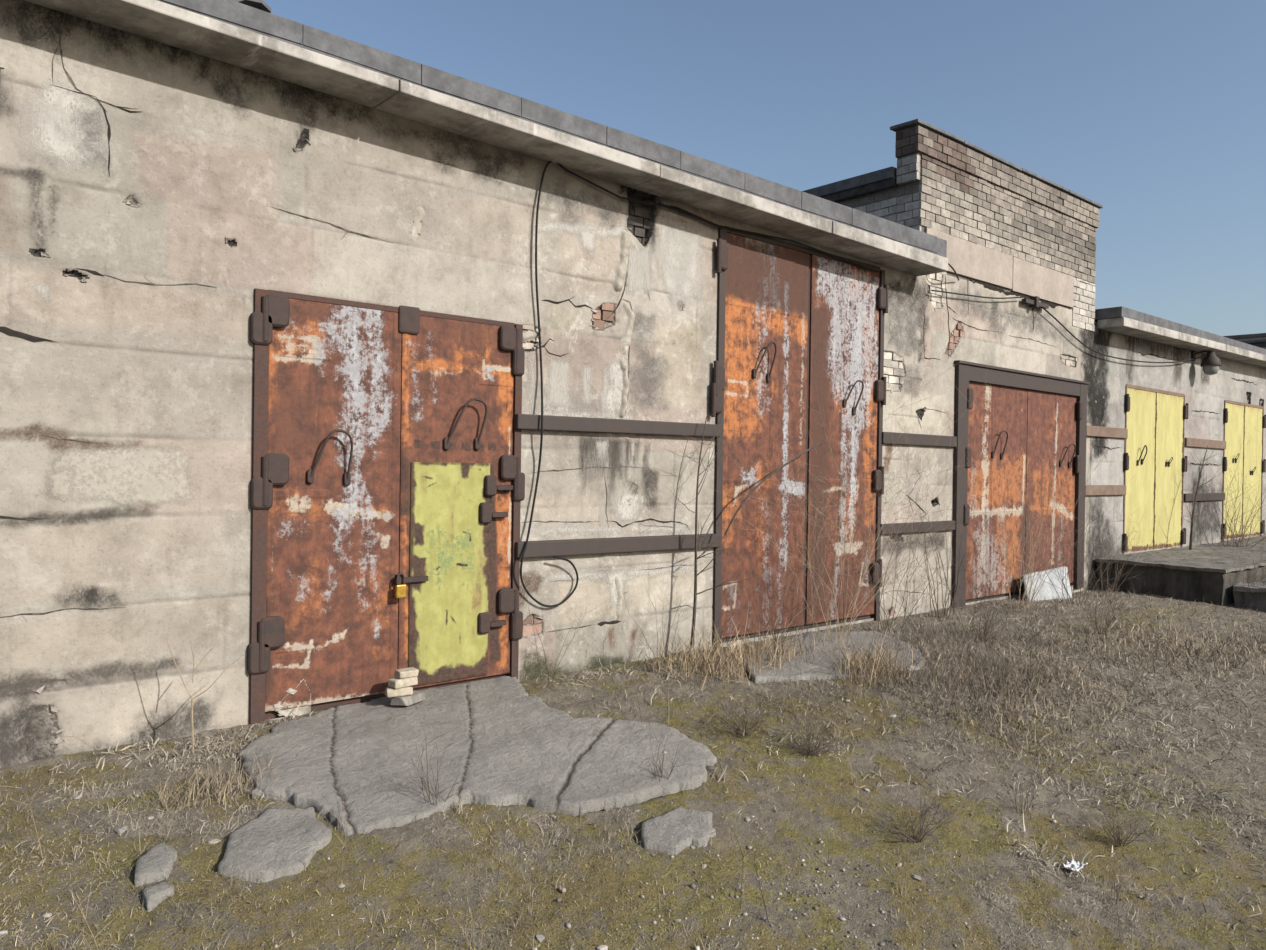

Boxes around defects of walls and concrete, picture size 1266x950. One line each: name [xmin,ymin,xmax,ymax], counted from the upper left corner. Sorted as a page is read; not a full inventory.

crack [37,13,141,177]
crack [270,206,393,243]
crack [76,268,217,288]
crack [543,256,650,318]
spalling [589,303,616,330]
crack [0,327,56,342]
crack [524,337,569,357]
leakage [69,659,178,683]
leakage [0,674,51,768]